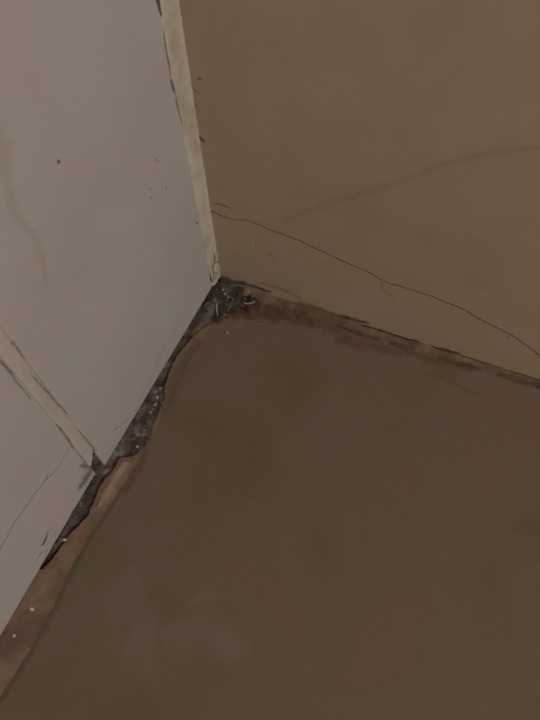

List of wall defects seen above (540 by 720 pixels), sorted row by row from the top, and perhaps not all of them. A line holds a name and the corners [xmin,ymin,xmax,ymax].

crack [211,203,540,356]
water stain [75,462,95,496]